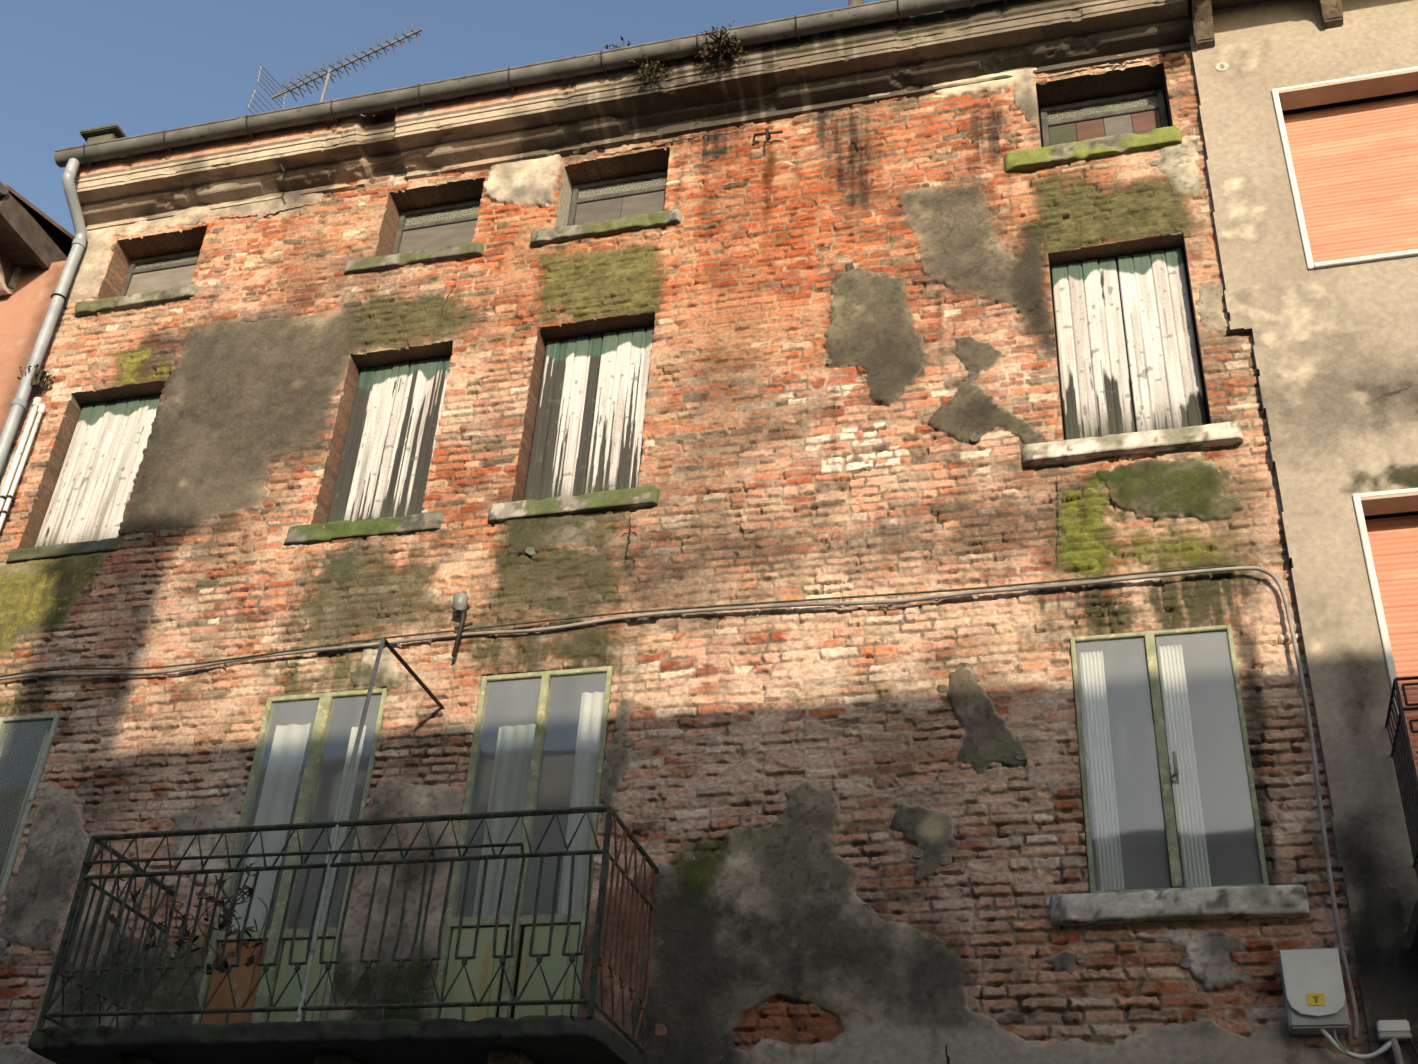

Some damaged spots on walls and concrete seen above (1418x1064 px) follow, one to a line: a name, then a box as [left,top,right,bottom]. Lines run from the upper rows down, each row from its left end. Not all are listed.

peeling [578,781,1366,1064]